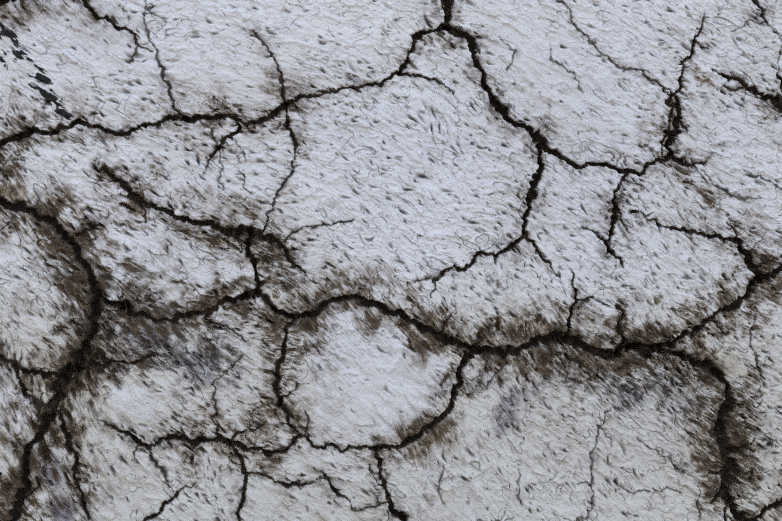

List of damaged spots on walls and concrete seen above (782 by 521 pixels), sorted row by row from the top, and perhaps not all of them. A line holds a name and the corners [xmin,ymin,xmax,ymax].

water stain [151,73,338,158]
crack [0,0,708,290]
crack [711,69,782,120]
crack [751,0,769,26]
water stain [0,113,782,521]
crack [0,165,782,521]